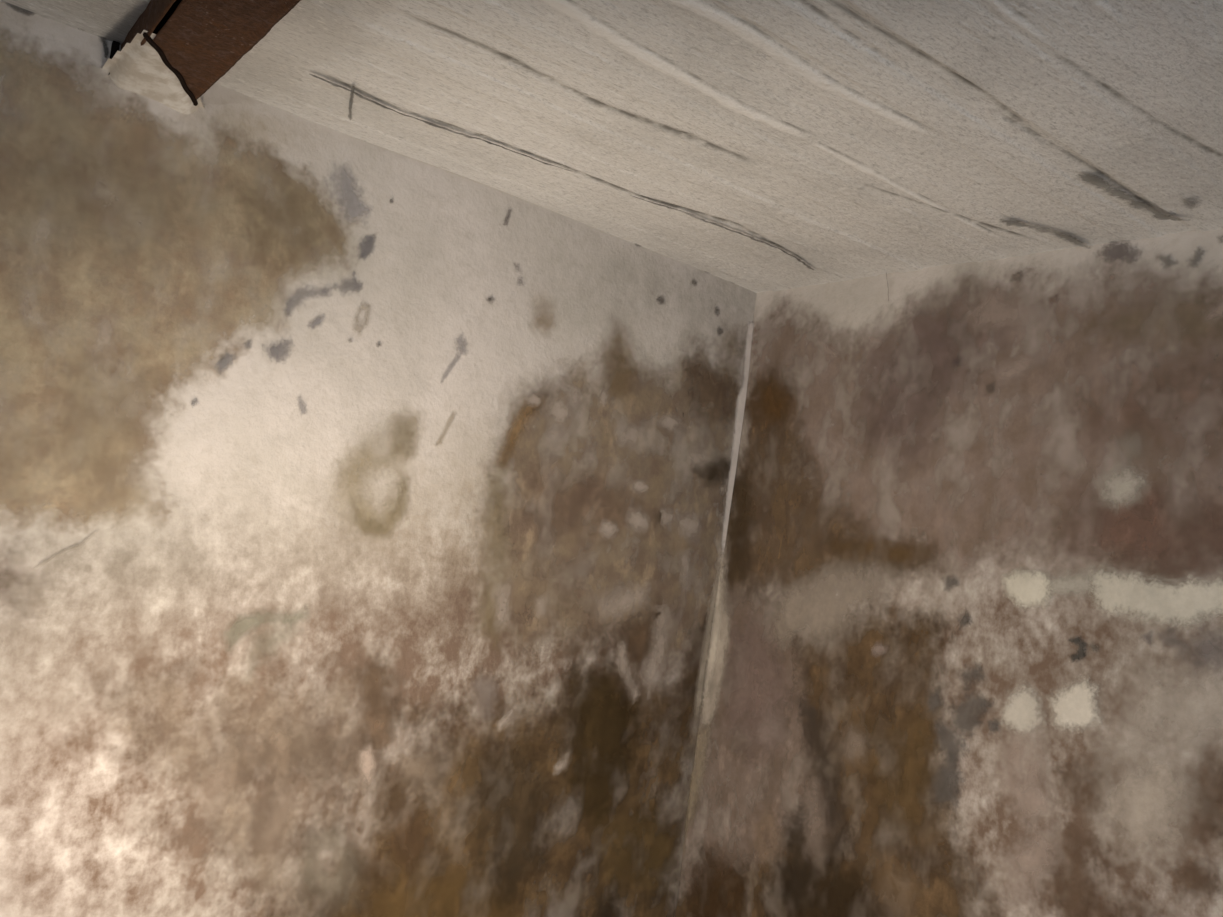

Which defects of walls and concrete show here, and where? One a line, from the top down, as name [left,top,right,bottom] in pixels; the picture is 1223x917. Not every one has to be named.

leakage [0,34,346,522]
leakage [128,667,392,888]
leakage [302,242,1223,917]